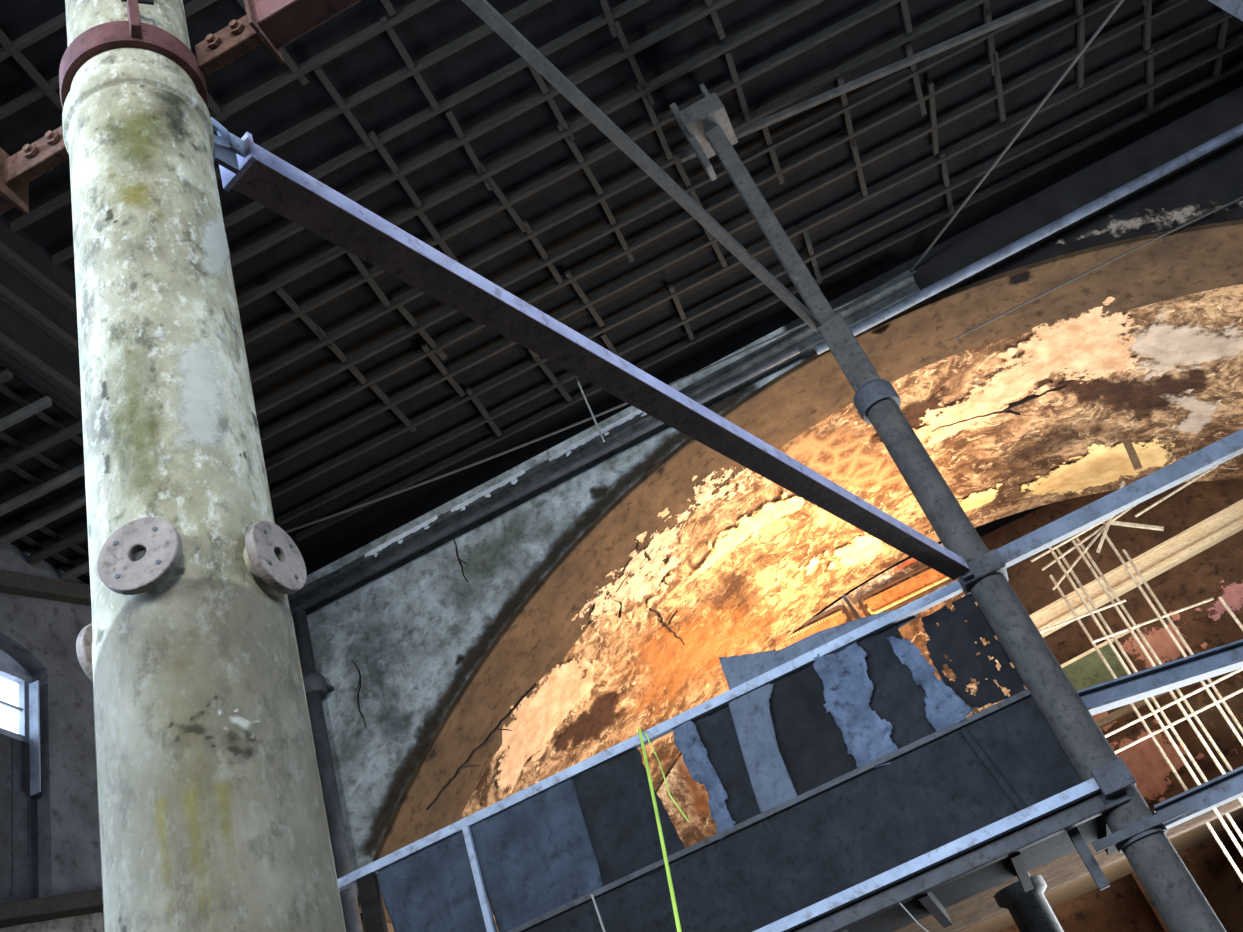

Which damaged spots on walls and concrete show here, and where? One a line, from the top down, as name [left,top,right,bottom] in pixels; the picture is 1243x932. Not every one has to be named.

flaking render [903,297,1243,496]
peeling [549,410,647,461]
peeling [785,427,910,491]
water stain [1005,424,1103,472]
flaking render [957,483,1002,512]
spalling [571,466,805,637]
flaking render [798,532,885,575]
peeling [1195,580,1243,621]
flaking render [1112,611,1207,669]
flaking render [473,658,627,807]
flaking render [1092,670,1243,802]